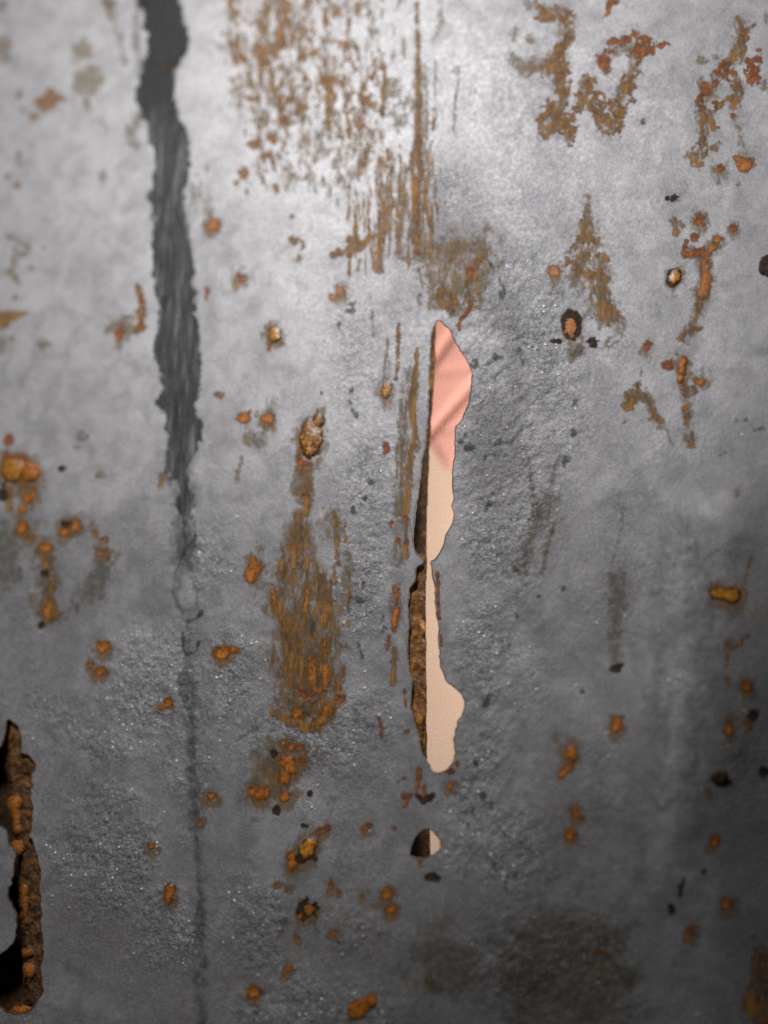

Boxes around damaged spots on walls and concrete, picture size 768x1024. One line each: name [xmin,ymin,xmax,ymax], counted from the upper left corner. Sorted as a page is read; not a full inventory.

rust [223,0,491,331]
rust [507,0,670,147]
rust [684,15,768,186]
rust [547,195,624,363]
rust [621,212,739,448]
rust [379,323,420,562]
rust [244,391,357,815]
peeling [414,710,424,743]
peeling [6,795,24,856]
peeling [10,1005,32,1014]
peeling [20,884,29,924]
peeling [21,948,36,979]